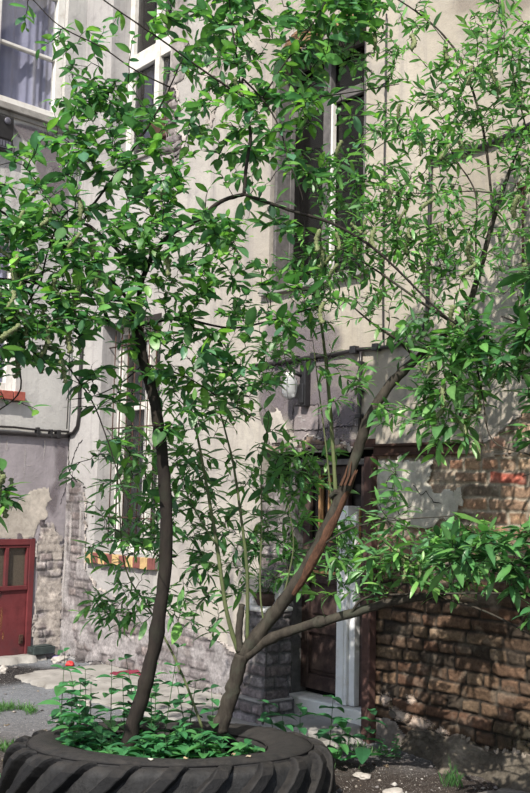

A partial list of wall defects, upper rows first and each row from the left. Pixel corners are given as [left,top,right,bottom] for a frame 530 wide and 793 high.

flaking render [377,455,464,529]
flaking render [0,478,153,672]
flaking render [155,612,236,695]